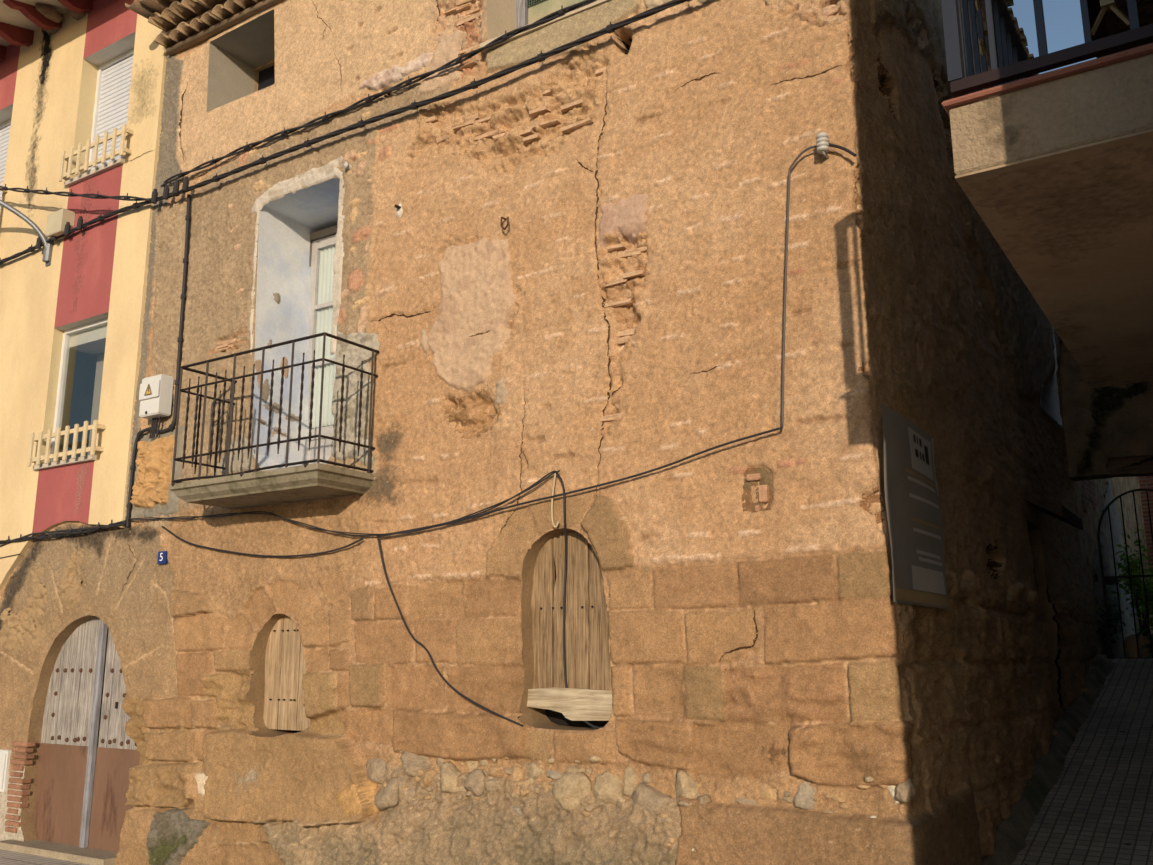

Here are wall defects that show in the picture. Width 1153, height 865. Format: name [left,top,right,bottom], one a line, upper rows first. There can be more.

leakage [28,30,52,204]
crack [125,90,186,162]
spalling [359,0,632,176]
peeling [420,237,527,439]
crack [576,80,621,497]
spalling [594,194,652,441]
crack [496,385,528,539]
crack [720,607,758,660]